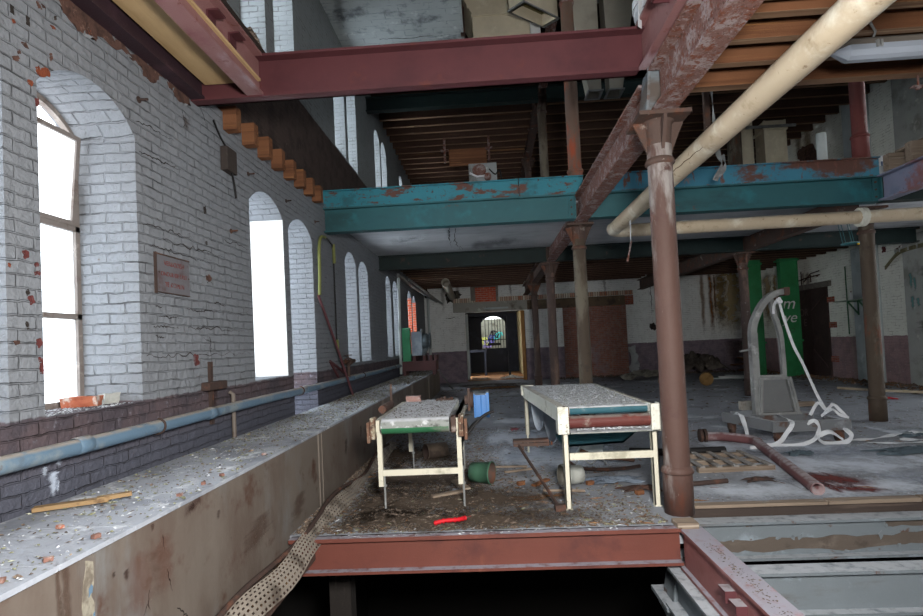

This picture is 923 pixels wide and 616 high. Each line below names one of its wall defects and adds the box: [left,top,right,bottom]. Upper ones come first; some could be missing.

spalling [50,0,191,107]
corrosion [700,275,716,325]
peeling [720,520,923,553]